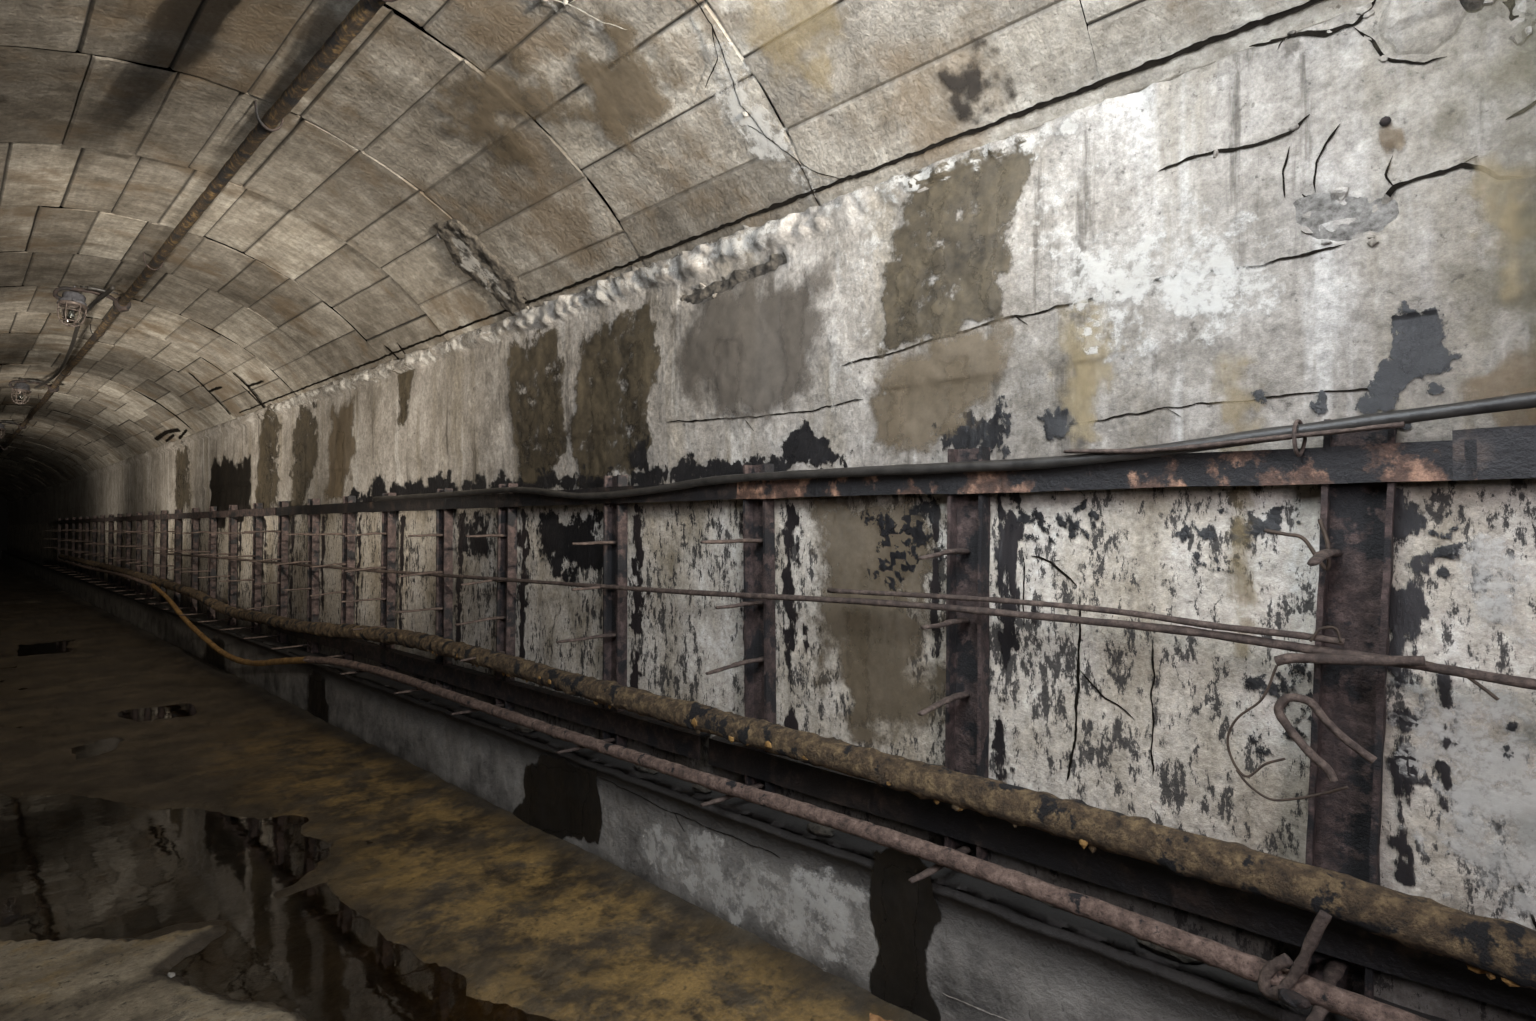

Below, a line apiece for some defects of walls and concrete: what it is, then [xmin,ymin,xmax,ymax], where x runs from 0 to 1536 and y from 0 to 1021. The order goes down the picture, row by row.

crack [188,0,1447,431]
crack [1372,156,1523,213]
leakage [1040,205,1285,360]
crack [154,428,187,442]
leakage [209,118,1100,689]
leakage [1309,390,1328,416]
leakage [1355,300,1464,430]
leakage [1171,505,1315,586]
leakage [991,697,1015,781]
leakage [1243,663,1313,761]
leakage [513,753,602,844]
leakage [642,824,941,1021]